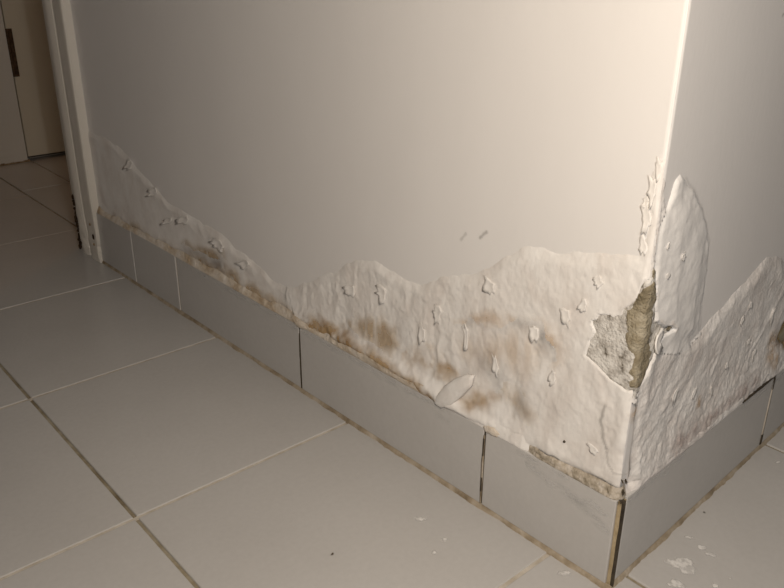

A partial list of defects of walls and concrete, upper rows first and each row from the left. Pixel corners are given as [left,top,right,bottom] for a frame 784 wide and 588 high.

peeling [88,0,784,500]